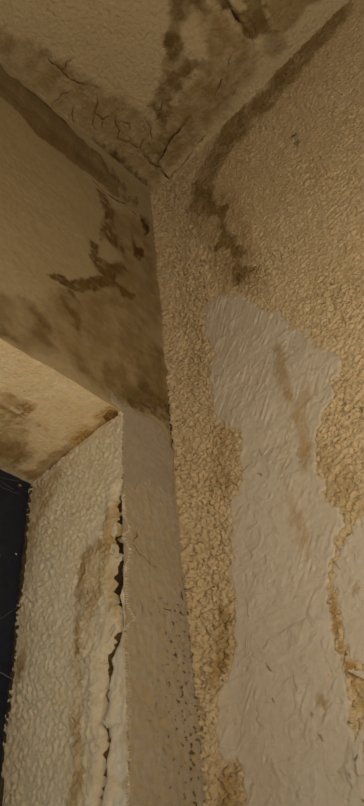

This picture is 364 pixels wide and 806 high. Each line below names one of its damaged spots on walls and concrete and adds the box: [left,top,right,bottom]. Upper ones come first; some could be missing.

crack [226,0,256,39]
damp [219,0,274,38]
crack [48,58,205,179]
damp [151,34,198,122]
damp [190,6,345,285]
damp [97,190,124,252]
damp [49,241,135,328]
peeling [91,413,136,806]
spalling [348,669,364,775]